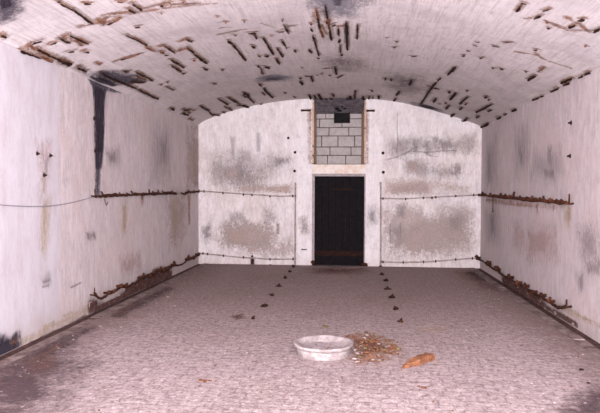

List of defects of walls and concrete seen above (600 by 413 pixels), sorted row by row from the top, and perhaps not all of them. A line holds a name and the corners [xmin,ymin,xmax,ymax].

spalling [17,34,90,73]
spalling [56,0,204,28]
spalling [113,33,208,75]
spalling [248,18,298,75]
spalling [308,4,361,59]
spalling [524,7,600,33]
spalling [94,61,175,100]
spalling [420,66,470,117]
spalling [532,70,592,101]
damp [89,79,121,195]
damp [218,221,293,255]
damp [384,206,474,257]